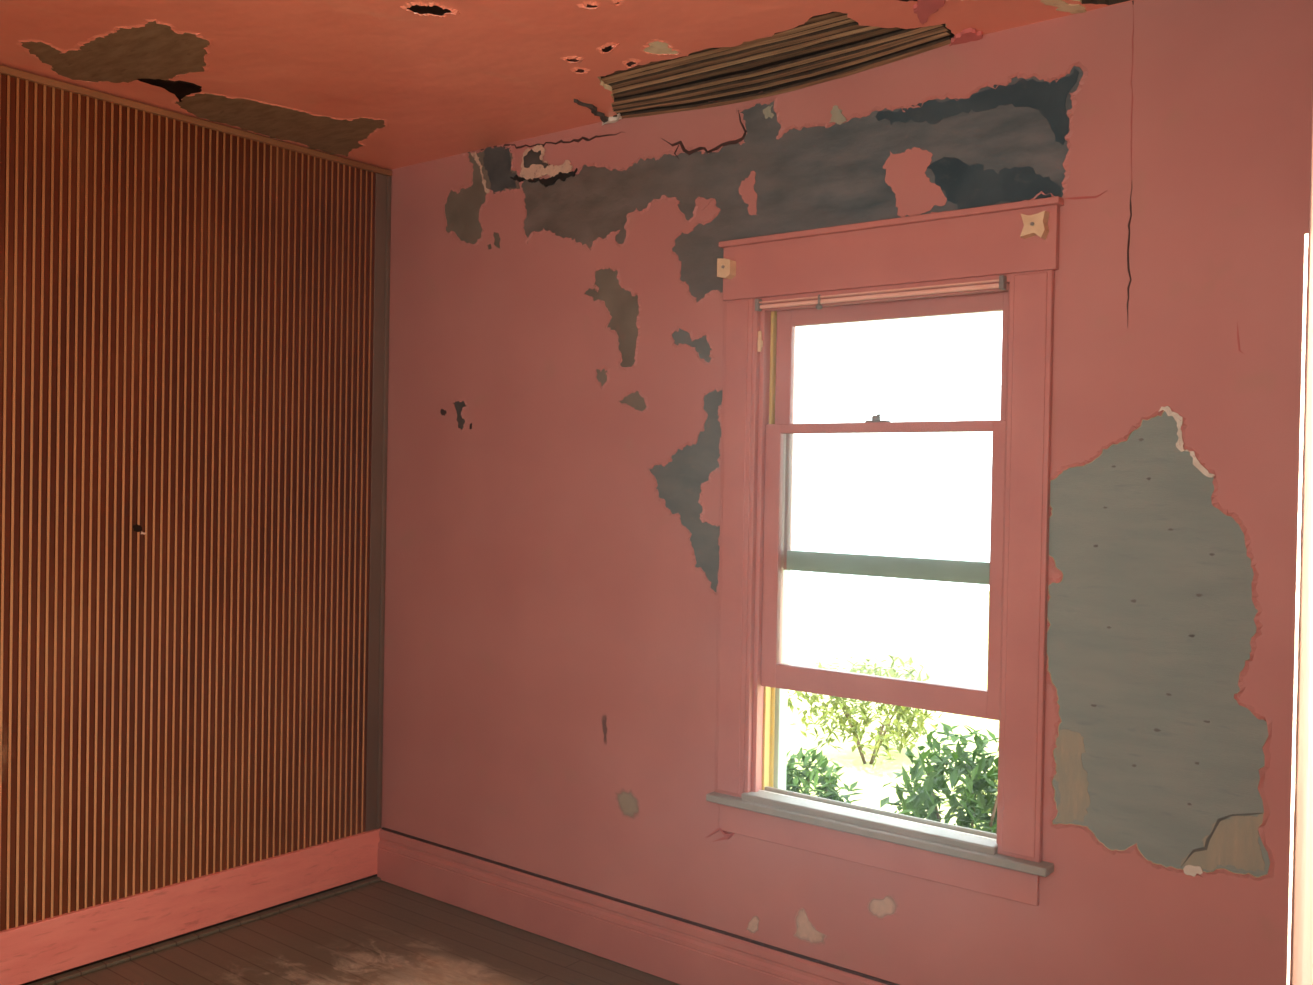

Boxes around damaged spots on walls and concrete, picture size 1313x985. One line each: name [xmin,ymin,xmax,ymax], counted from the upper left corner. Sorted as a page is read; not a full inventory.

flaking render [16,19,388,157]
peeling [639,39,683,56]
flaking render [443,61,1088,306]
crack [1064,188,1132,328]
peeling [583,265,642,390]
peeling [616,389,649,415]
peeling [670,324,715,365]
peeling [646,387,723,596]
flaking render [1046,233,1309,985]